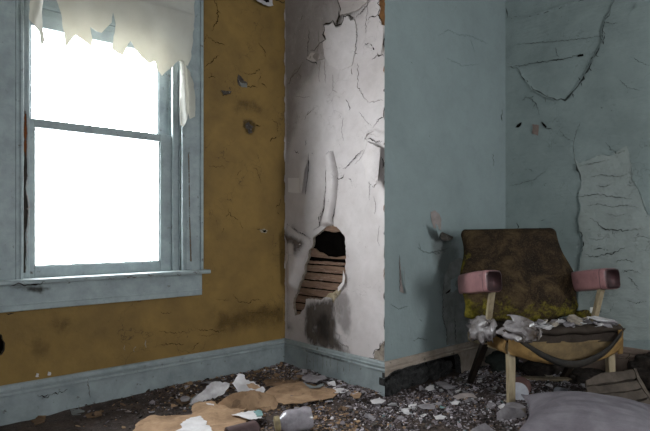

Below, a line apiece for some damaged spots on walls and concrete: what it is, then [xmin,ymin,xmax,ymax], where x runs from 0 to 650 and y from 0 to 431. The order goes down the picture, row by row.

peeling [306,0,385,70]
crack [319,63,383,135]
crack [511,0,614,113]
crack [315,150,365,229]
flaking render [293,225,346,316]
flaking render [573,134,650,341]